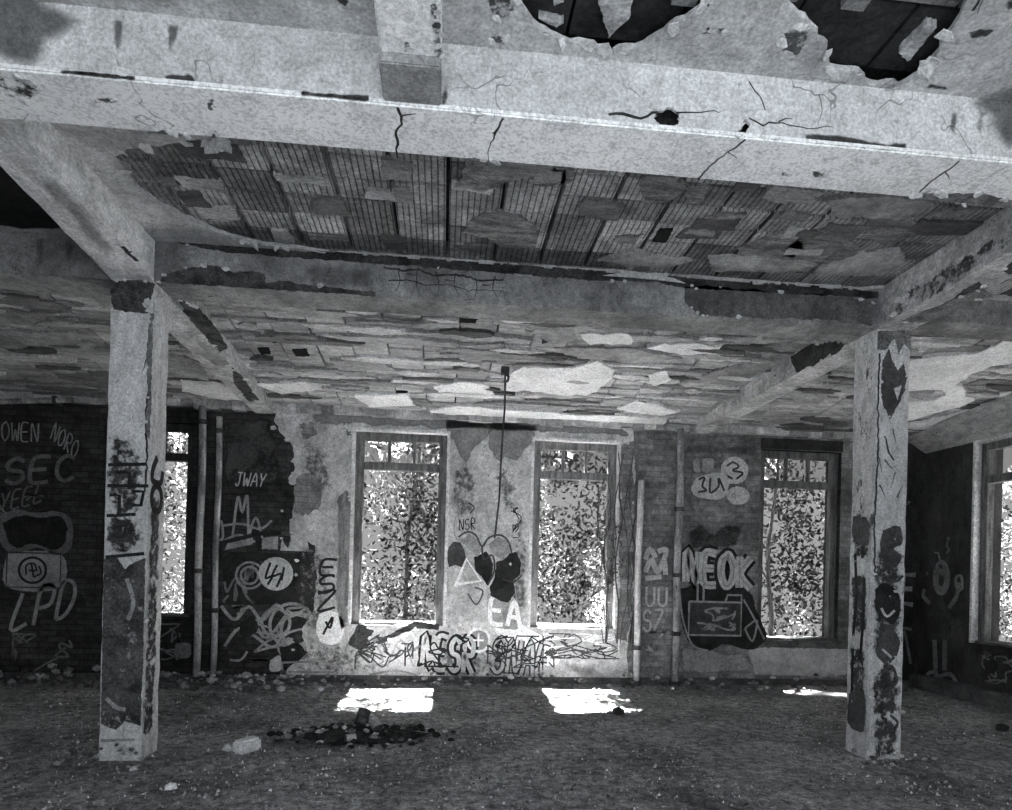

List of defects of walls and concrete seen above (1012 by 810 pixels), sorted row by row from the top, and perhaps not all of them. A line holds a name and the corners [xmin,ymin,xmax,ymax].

peeling [430,4,446,59]
flaking render [487,0,714,58]
flaking render [776,0,964,80]
crack [395,107,416,154]
crack [608,110,720,120]
crack [697,81,832,180]
damp [981,99,1012,142]
flaking render [114,117,1012,434]
flaking render [0,263,855,642]